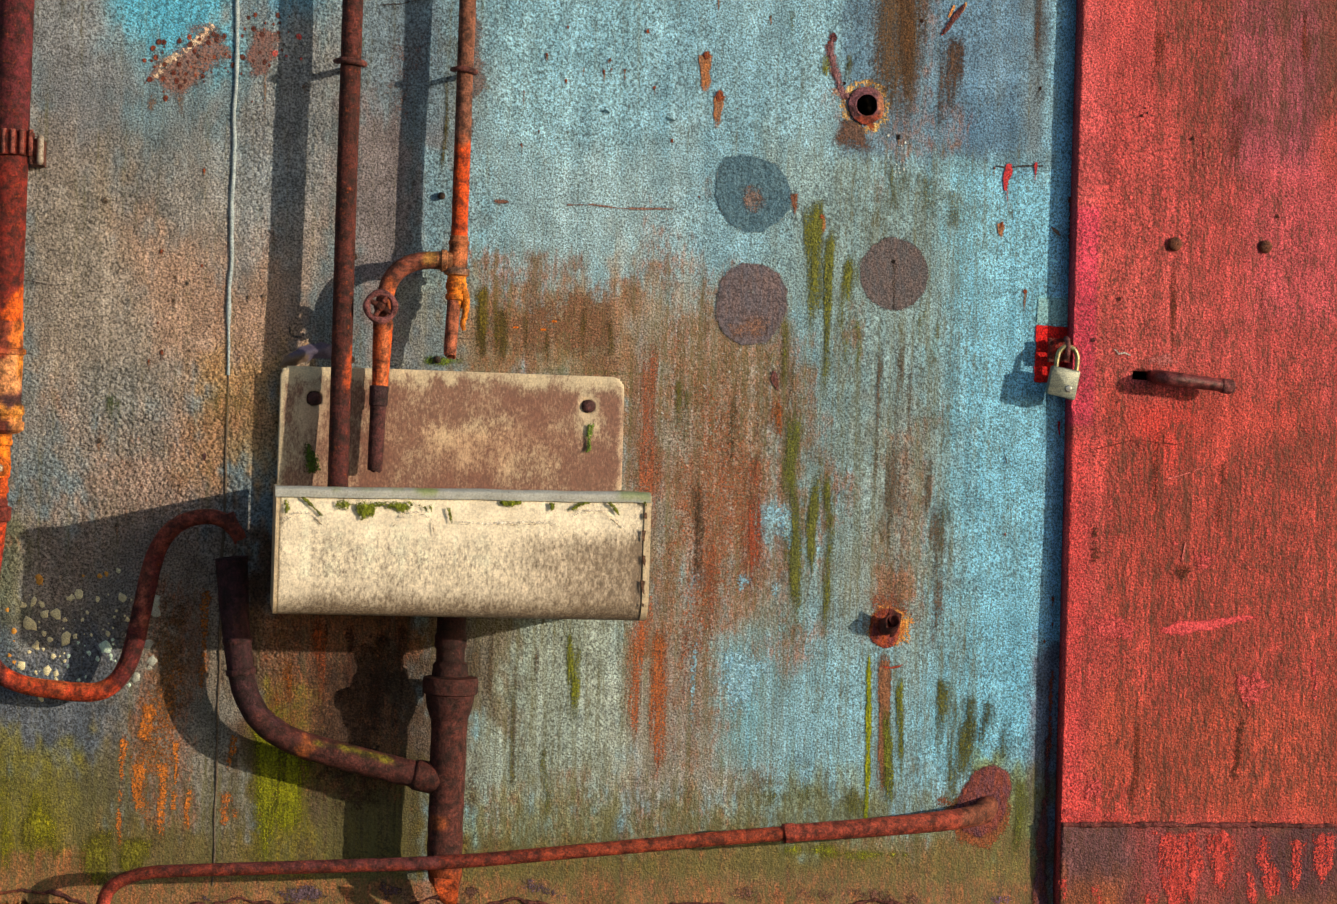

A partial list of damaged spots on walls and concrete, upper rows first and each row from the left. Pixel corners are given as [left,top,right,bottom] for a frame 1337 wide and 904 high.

spalling [143,12,303,120]
rust [825,0,967,152]
rust [475,287,615,366]
rust [626,331,784,776]
rust [115,588,212,845]
rust [310,622,407,751]
rust [867,592,918,791]
rust [935,764,1014,852]
rust [1033,670,1054,904]
rust [0,888,88,904]
peeling [273,884,327,903]
peeling [434,878,482,904]